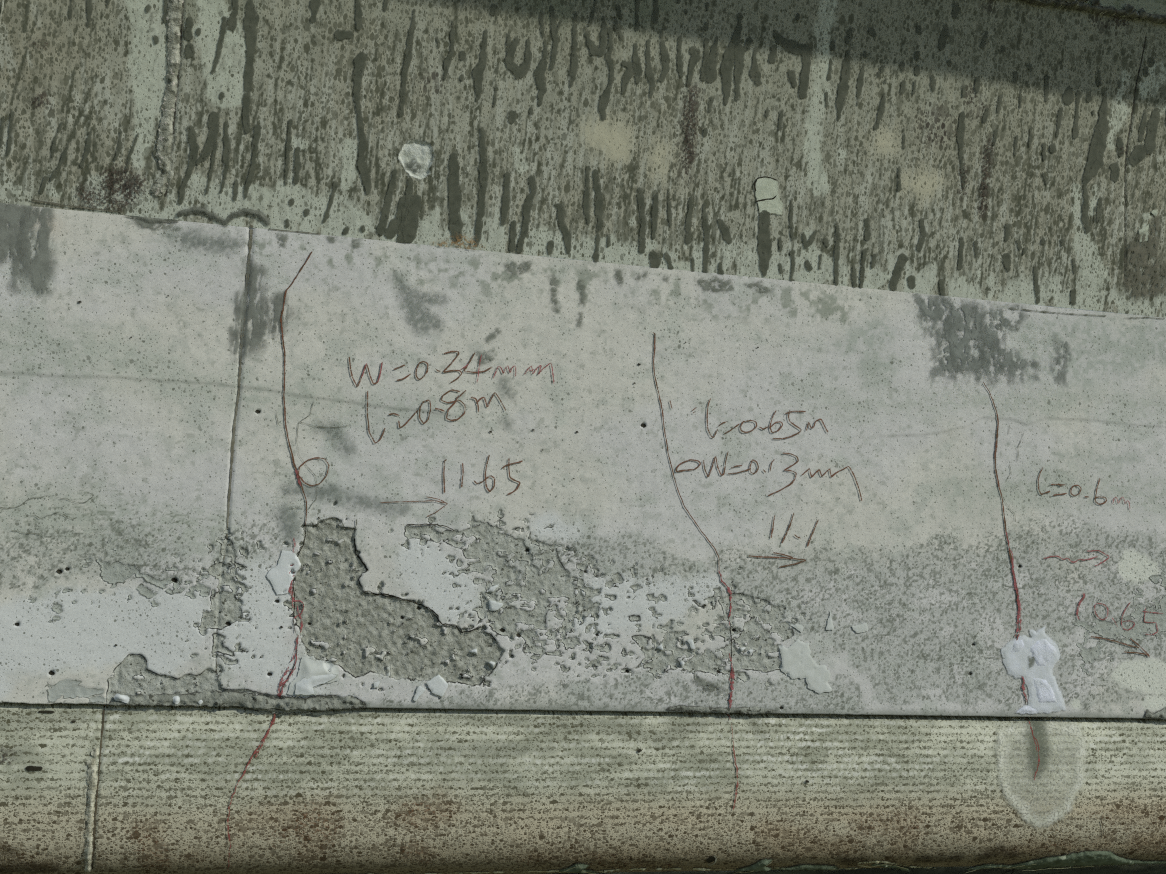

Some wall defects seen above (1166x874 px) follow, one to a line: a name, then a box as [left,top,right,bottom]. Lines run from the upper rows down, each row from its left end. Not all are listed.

water stain [178,0,261,204]
water stain [328,170,421,248]
water stain [448,127,489,246]
water stain [501,172,537,274]
water stain [505,0,811,164]
water stain [637,187,876,293]
water stain [889,218,1037,383]
water stain [1014,70,1160,233]
peeling [29,523,323,706]
crack [276,395,474,692]
spalling [266,501,832,701]
water stain [990,627,1087,827]